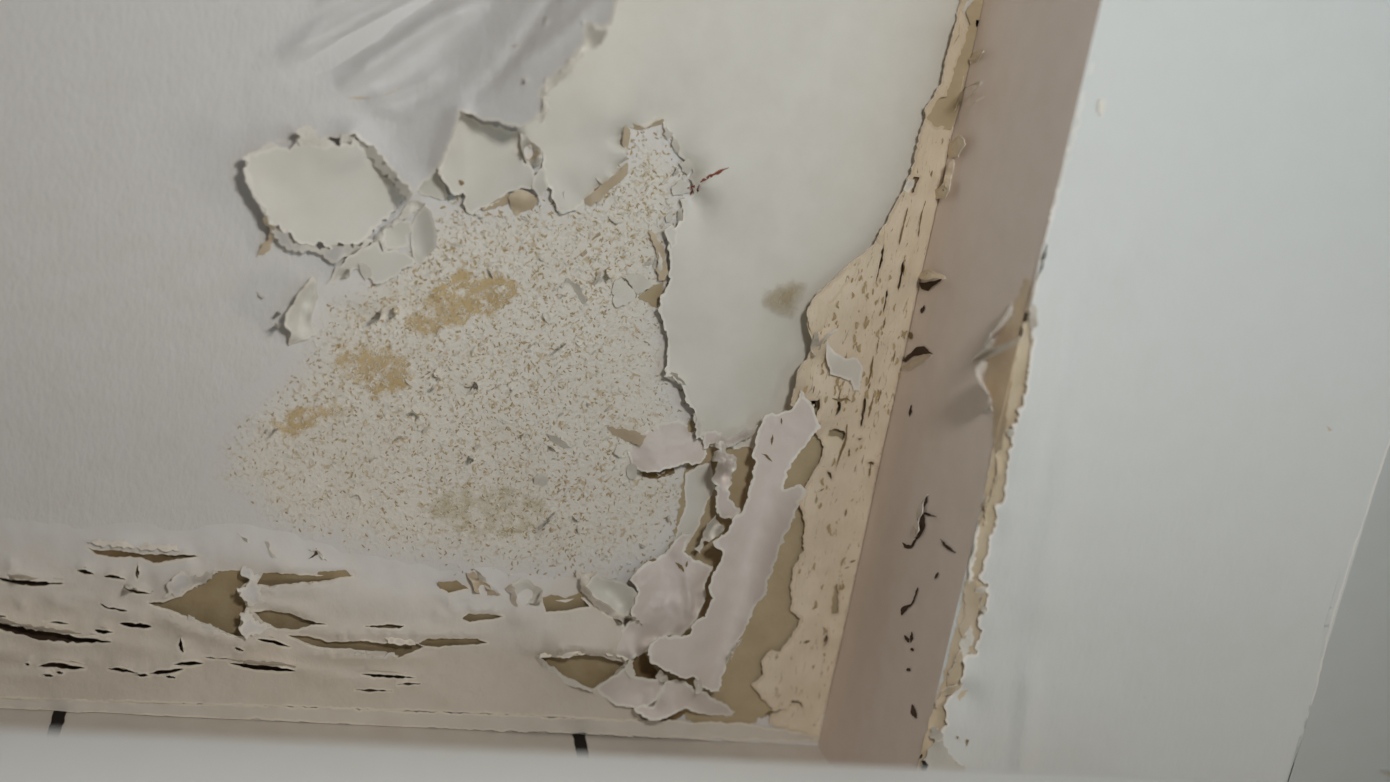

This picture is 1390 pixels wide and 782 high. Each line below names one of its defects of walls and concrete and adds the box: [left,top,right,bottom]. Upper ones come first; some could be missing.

damp [408,268,516,333]
damp [337,350,409,393]
peeling [197,0,974,724]
damp [274,407,333,435]
flaking render [918,279,1033,770]